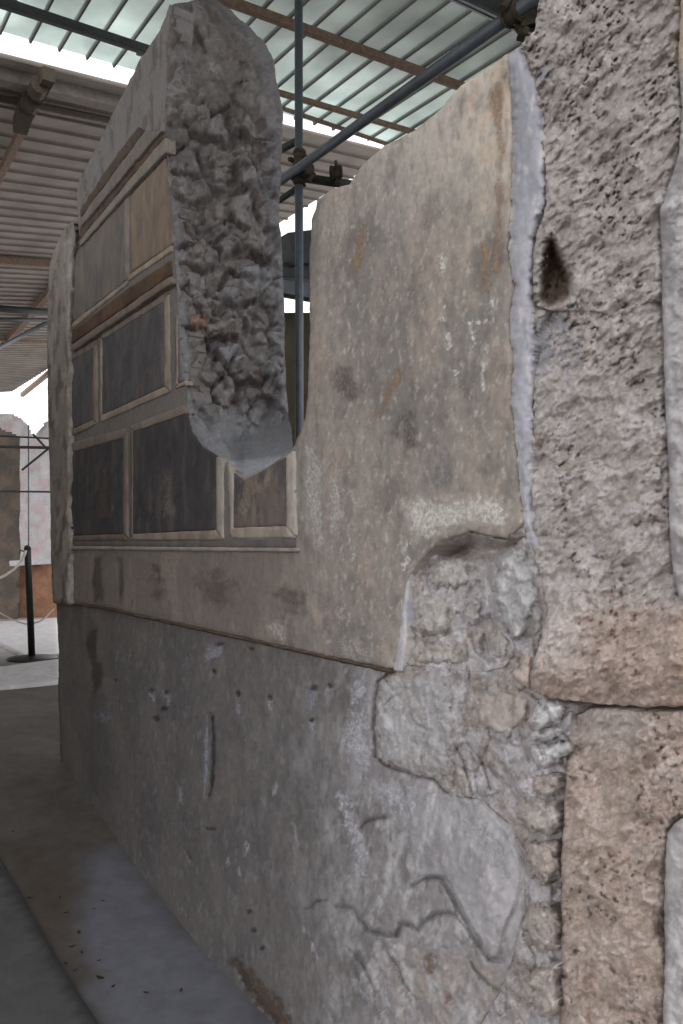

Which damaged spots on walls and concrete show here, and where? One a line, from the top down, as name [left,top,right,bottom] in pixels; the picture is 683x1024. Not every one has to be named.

spalling [249,248,271,264]
damp [388,496,508,571]
spalling [73,532,538,776]